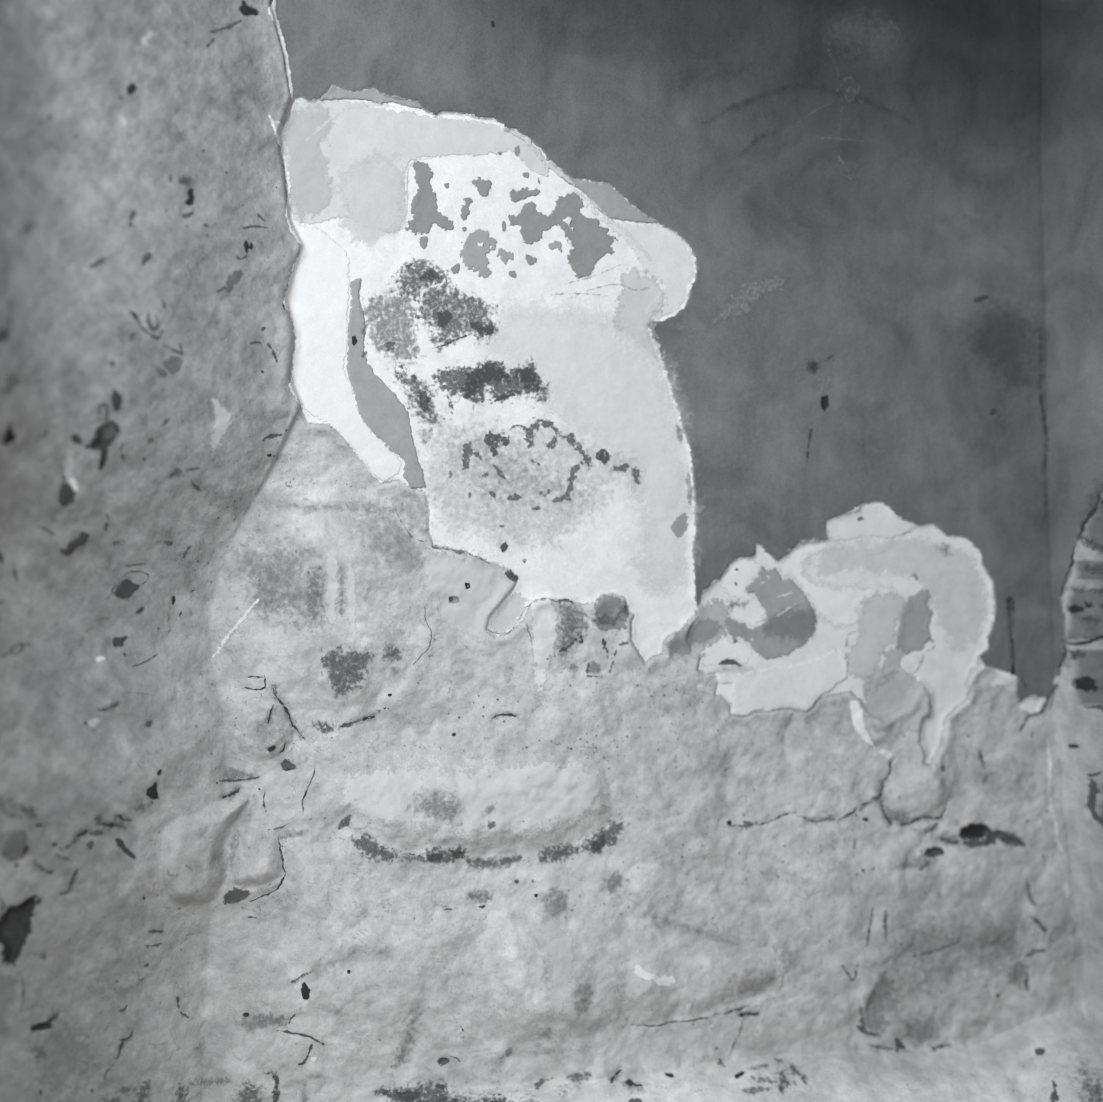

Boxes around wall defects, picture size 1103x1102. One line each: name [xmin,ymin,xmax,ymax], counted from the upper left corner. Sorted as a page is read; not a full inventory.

flaking render [268,0,1055,764]
spalling [221,768,260,782]
spalling [281,759,296,771]
crack [727,758,947,856]